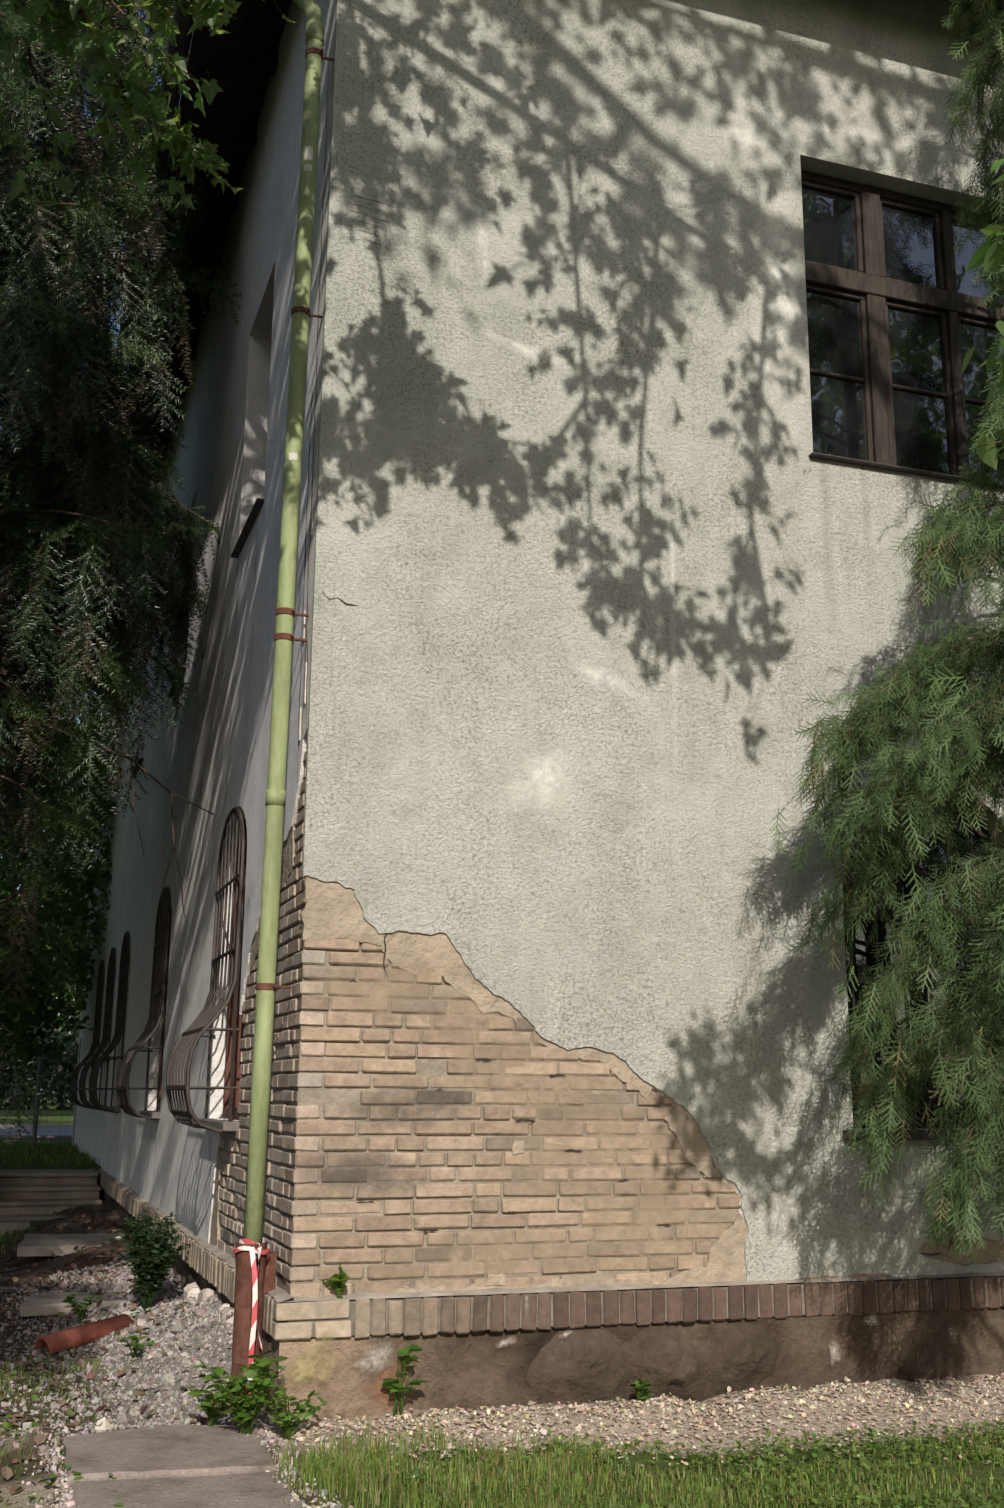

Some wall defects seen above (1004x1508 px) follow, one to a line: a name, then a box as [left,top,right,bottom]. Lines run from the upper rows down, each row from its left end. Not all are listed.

spalling [210,920,260,1259]
spalling [263,745,748,1299]
spalling [918,1237,1004,1265]